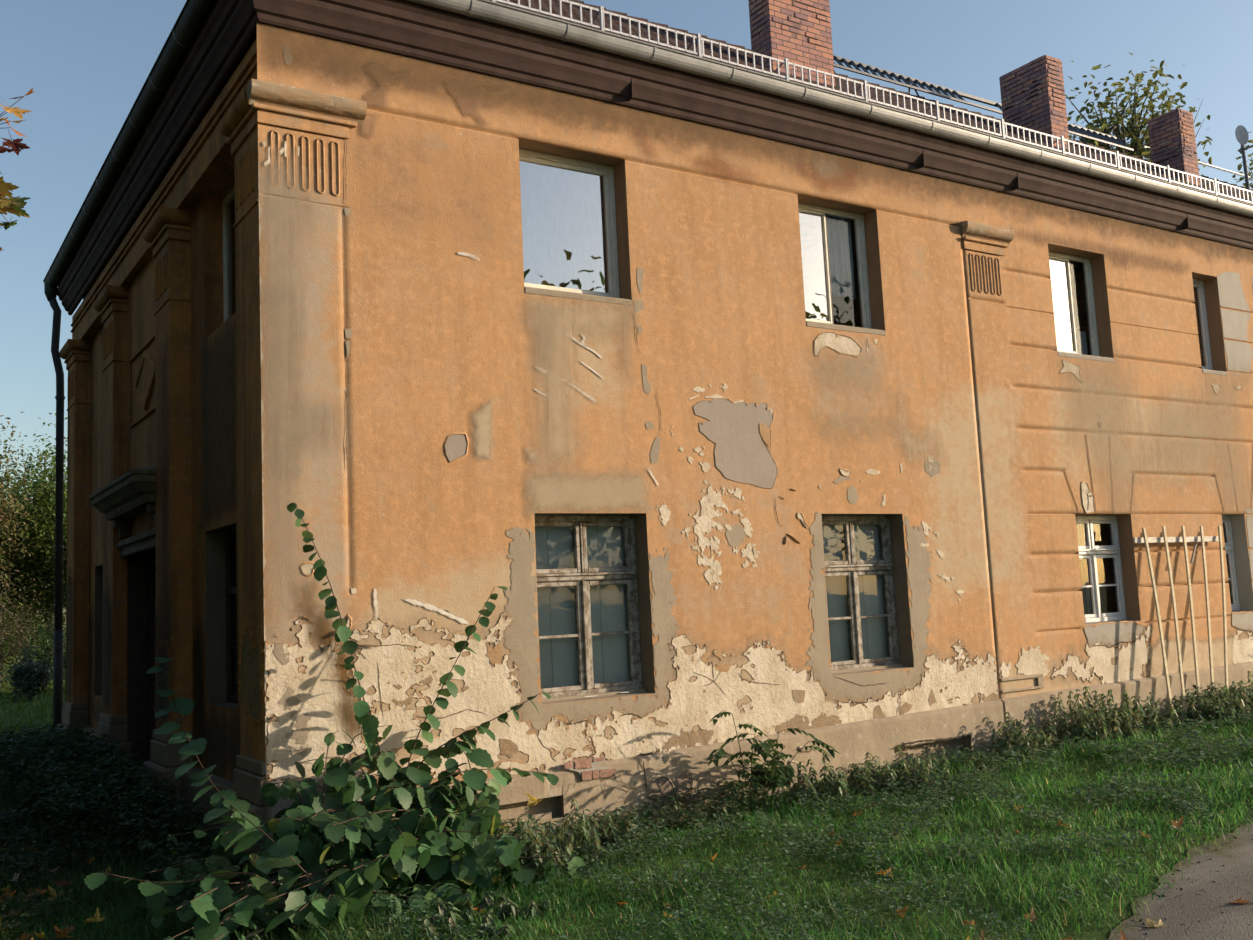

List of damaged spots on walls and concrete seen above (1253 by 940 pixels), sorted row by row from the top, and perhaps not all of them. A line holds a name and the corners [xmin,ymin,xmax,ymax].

spalling [258,134,300,366]
peeling [689,383,773,447]
peeling [813,331,878,358]
peeling [238,399,1253,781]